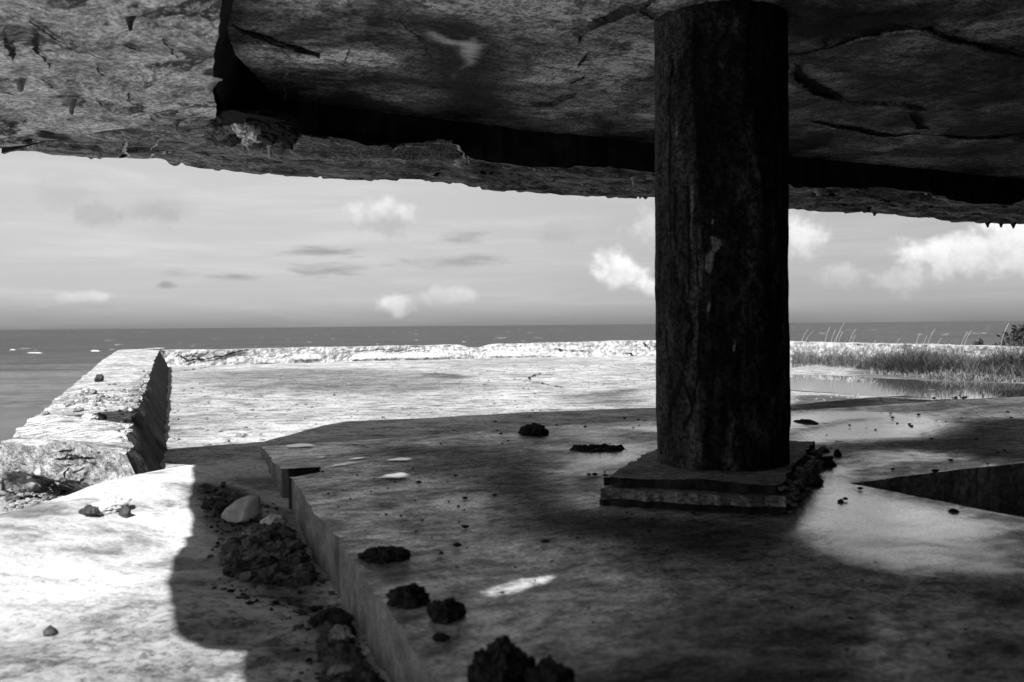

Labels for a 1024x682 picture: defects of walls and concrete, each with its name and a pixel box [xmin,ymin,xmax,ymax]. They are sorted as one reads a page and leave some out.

crack [232,25,351,101]
crack [525,0,657,108]
crack [788,27,1024,143]
spalling [7,122,70,145]
spalling [204,109,470,165]